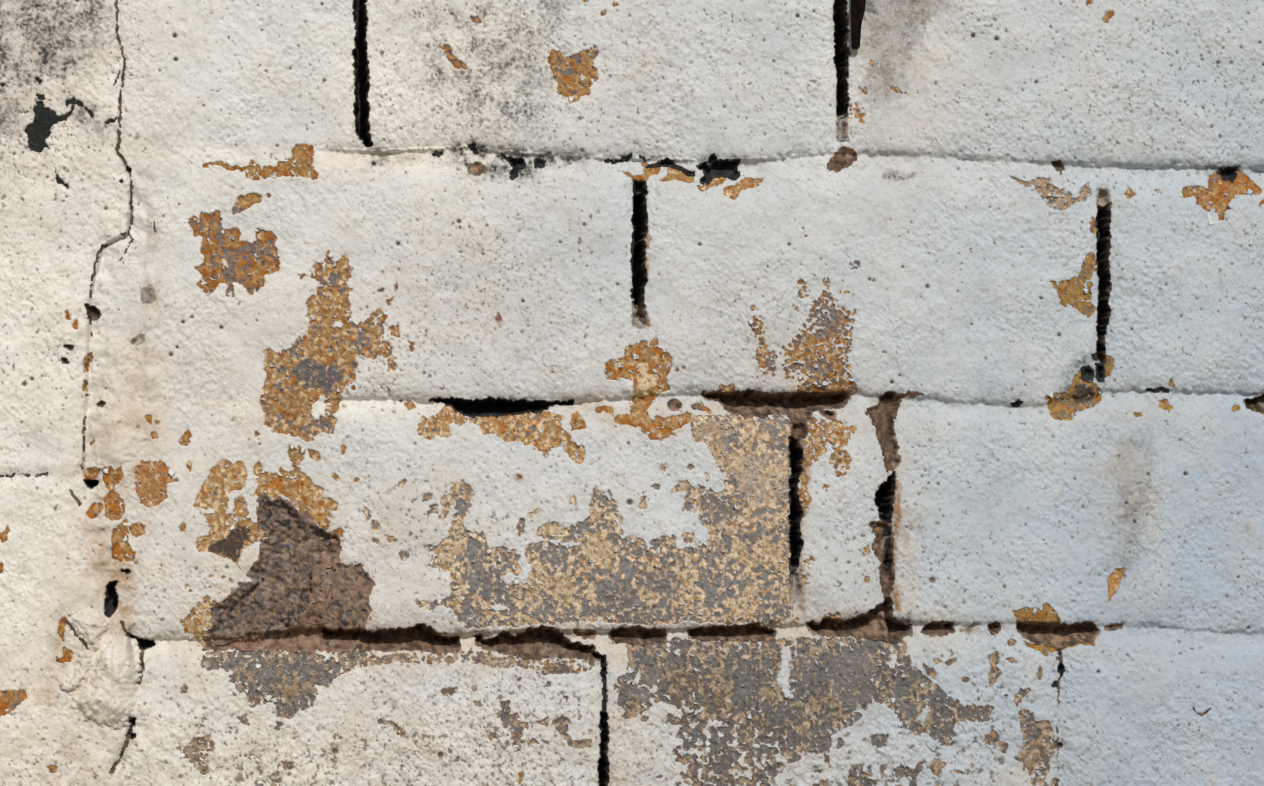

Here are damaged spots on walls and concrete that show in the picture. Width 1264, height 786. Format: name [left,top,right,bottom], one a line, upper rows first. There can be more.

peeling [443,45,467,70]
peeling [548,46,599,103]
peeling [188,144,318,297]
peeling [1181,170,1264,225]
crack [0,0,157,506]
peeling [83,461,192,563]
peeling [175,251,1125,786]
peeling [57,617,73,663]
crack [56,621,89,662]
crack [104,569,156,684]
peeling [0,689,27,716]
crack [109,716,137,774]